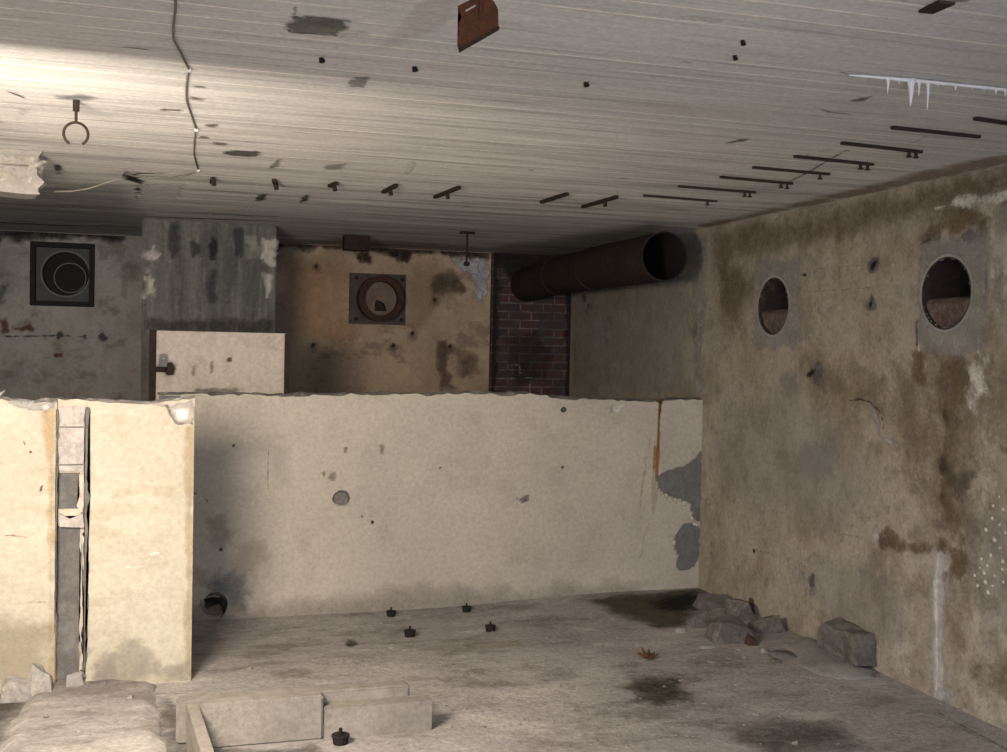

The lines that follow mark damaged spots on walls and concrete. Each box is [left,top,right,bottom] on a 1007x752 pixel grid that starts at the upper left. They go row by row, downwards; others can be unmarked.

water stain [432,273,465,294]
peeling [452,257,490,303]
water stain [437,342,451,386]
spalling [0,392,54,410]
rust [653,399,663,478]
peeling [656,452,702,570]
water stain [873,321,972,705]